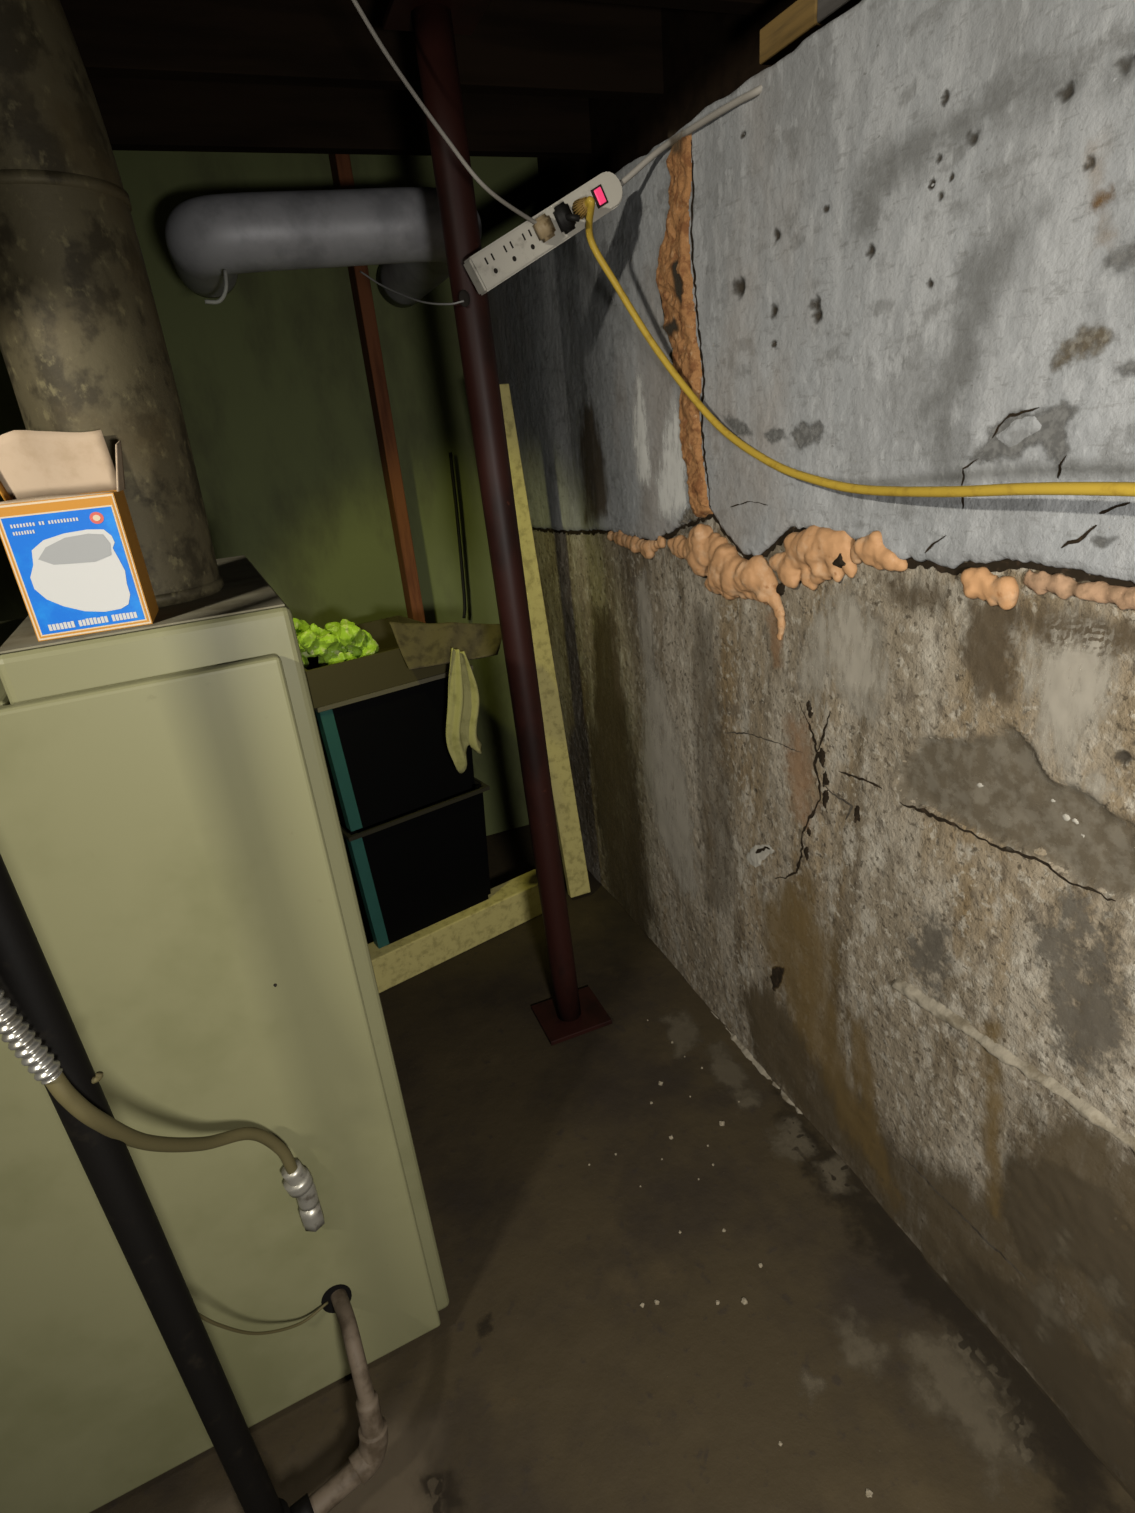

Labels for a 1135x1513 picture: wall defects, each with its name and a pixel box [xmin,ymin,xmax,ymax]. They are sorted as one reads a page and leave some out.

crack [532,132,1135,659]
peeling [970,402,1077,478]
crack [725,700,882,879]
spalling [900,729,1135,902]
water stain [909,915,950,998]
water stain [1035,893,1132,1073]
water stain [662,987,1135,1513]